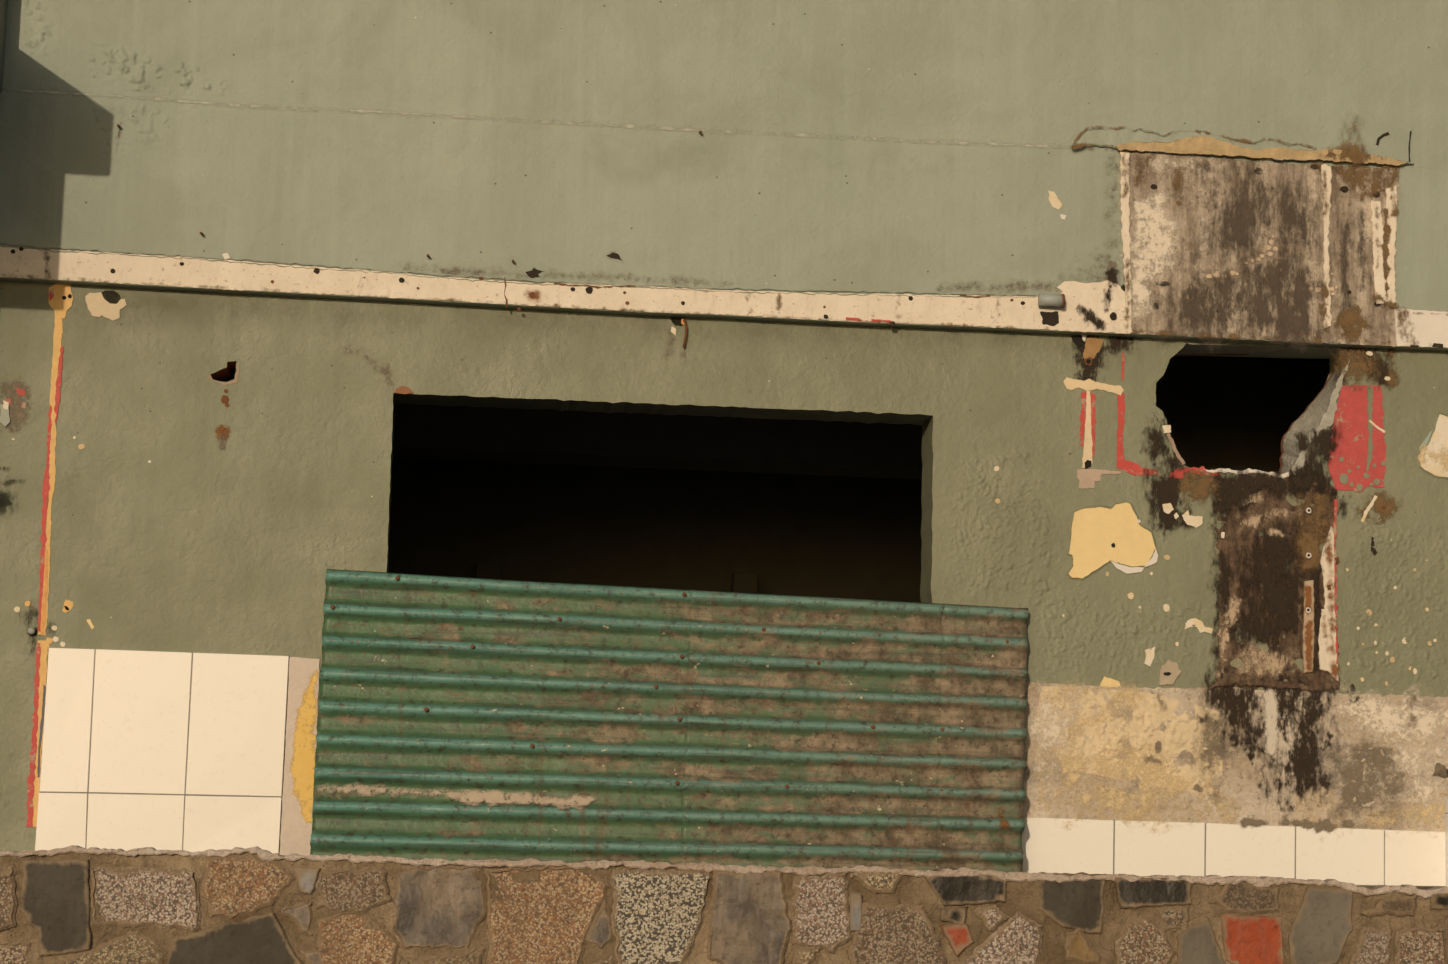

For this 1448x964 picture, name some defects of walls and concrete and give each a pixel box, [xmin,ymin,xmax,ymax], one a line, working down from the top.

spalling [1071,123,1414,174]
peeling [1048,191,1066,220]
peeling [1063,302,1448,581]
peeling [0,242,1128,827]
damp [1296,493,1333,571]
damp [1324,582,1339,679]
spalling [1357,609,1417,675]
spalling [1036,618,1225,798]
damp [1027,684,1448,833]
spalling [1338,703,1448,816]